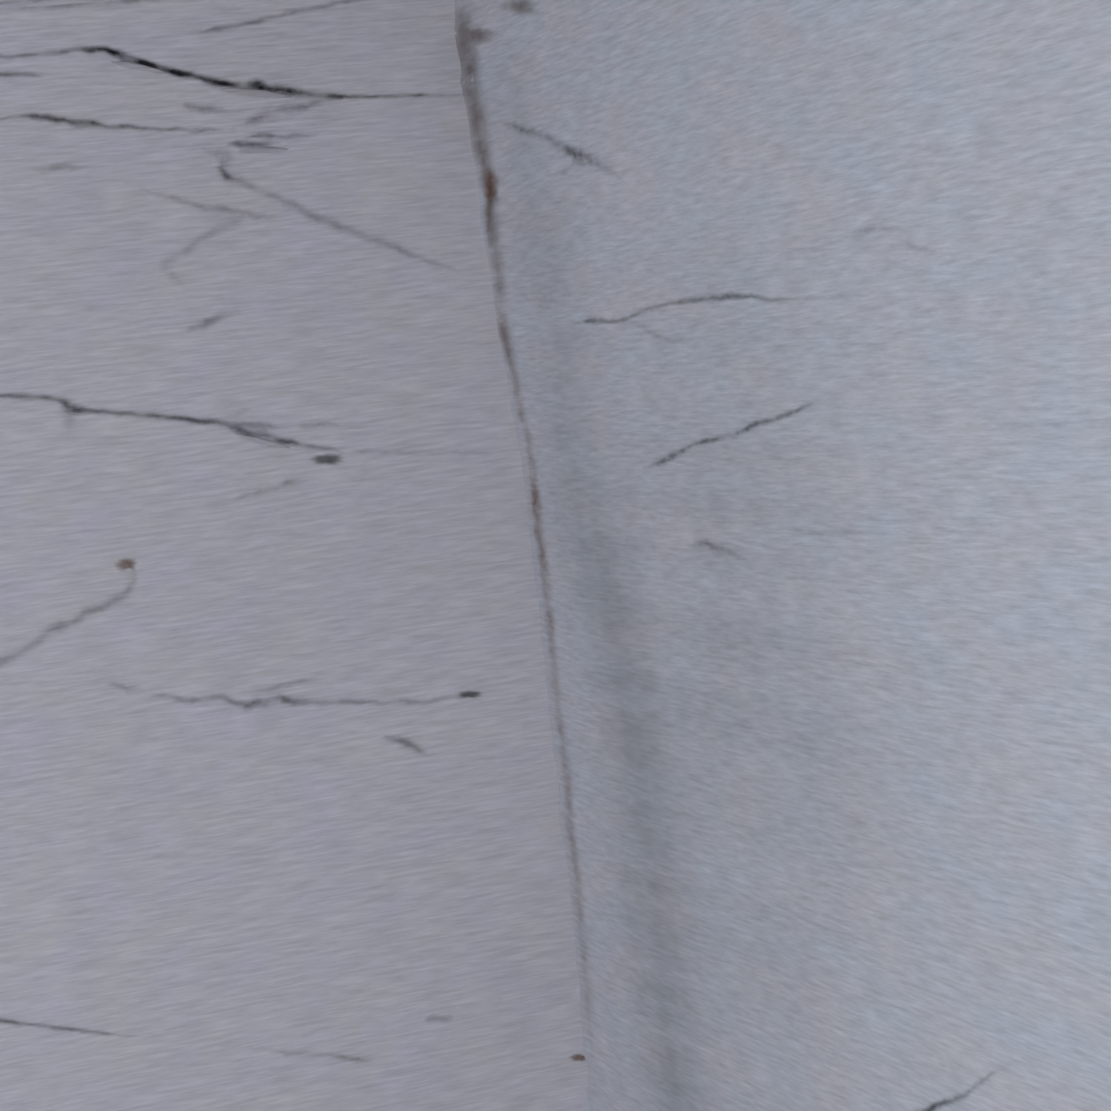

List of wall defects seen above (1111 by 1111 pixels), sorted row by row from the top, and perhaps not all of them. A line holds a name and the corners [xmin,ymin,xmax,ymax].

crack [87,47,301,98]
crack [32,115,95,124]
crack [223,147,288,179]
crack [121,560,133,568]